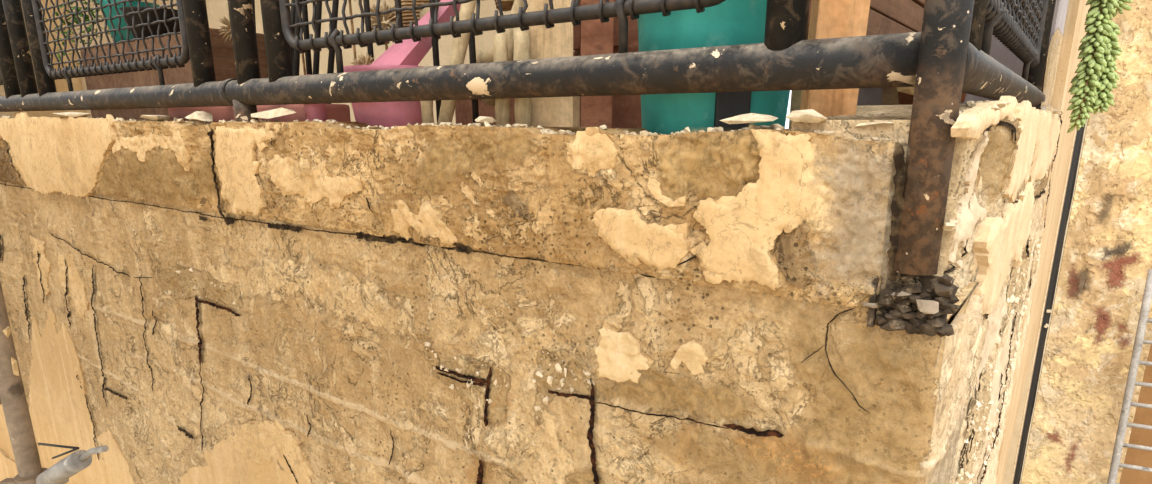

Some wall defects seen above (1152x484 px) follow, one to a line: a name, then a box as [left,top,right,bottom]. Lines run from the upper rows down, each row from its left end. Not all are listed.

crack [0,232,157,460]
flaking render [29,235,135,484]
flaking render [0,112,191,197]
crack [178,295,241,451]
flaking render [135,252,655,484]
crack [436,366,492,426]
crack [476,460,484,484]
flaking render [564,127,623,182]
crack [548,378,784,484]
flaking render [648,129,839,290]
spalling [863,28,1063,484]
crack [960,111,1063,484]